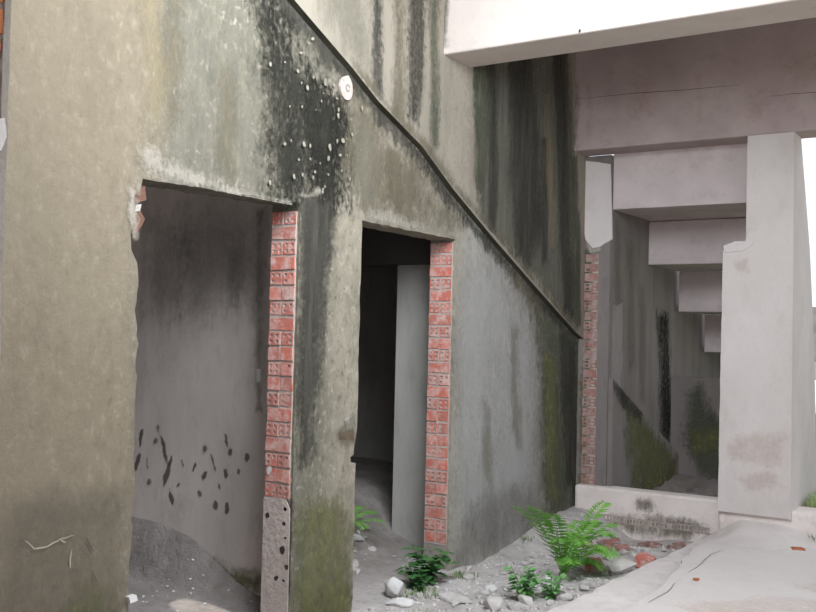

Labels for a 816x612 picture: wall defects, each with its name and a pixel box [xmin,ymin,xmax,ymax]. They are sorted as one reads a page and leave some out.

damp [372,0,383,95]
damp [394,0,448,146]
damp [250,0,362,468]
damp [461,53,592,519]
spalling [134,429,148,471]
spalling [154,425,240,505]